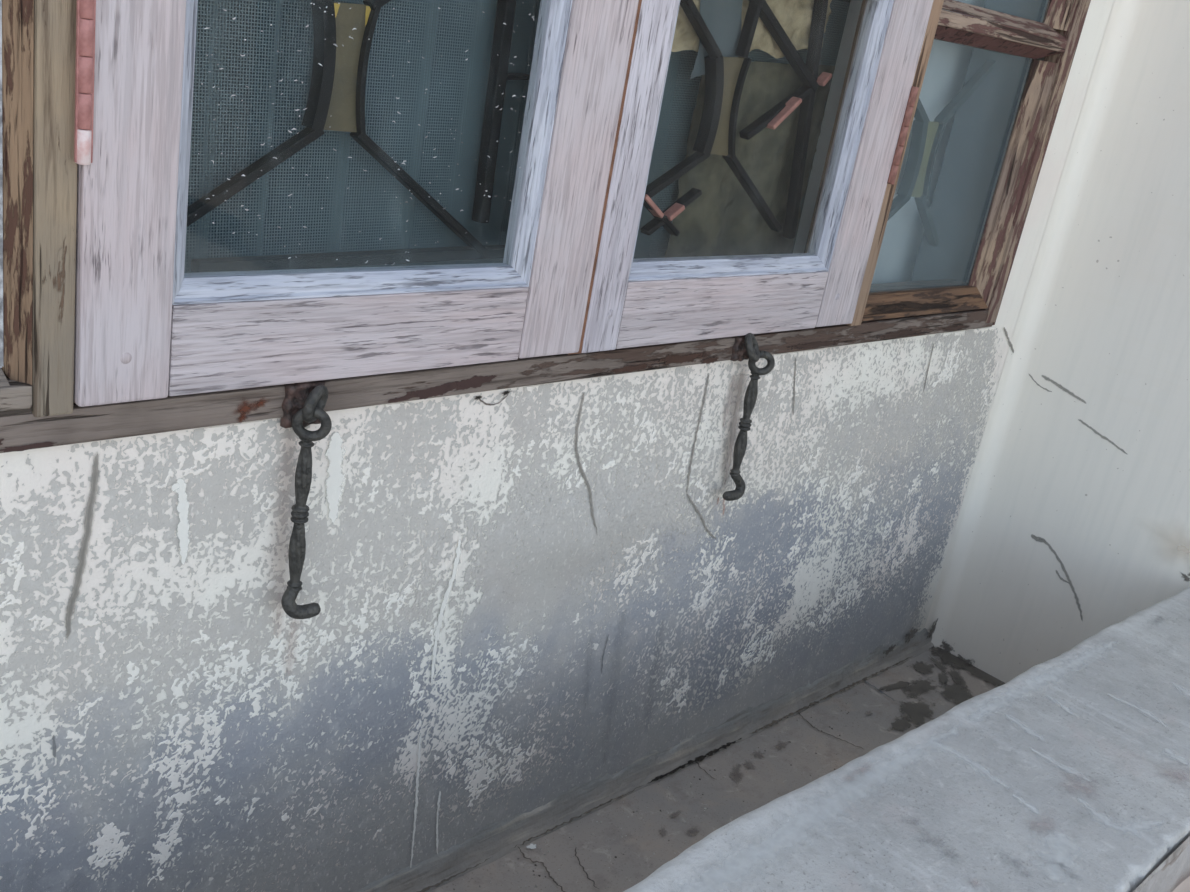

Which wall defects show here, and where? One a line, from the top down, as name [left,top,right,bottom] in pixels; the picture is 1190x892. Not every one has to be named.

rust [237,400,266,422]
crack [575,394,597,532]
crack [687,375,716,539]
crack [1004,327,1127,454]
crack [66,454,99,637]
peeling [0,326,1003,892]
crack [1031,535,1082,620]
crack [514,657,911,892]
water stain [878,619,1111,781]